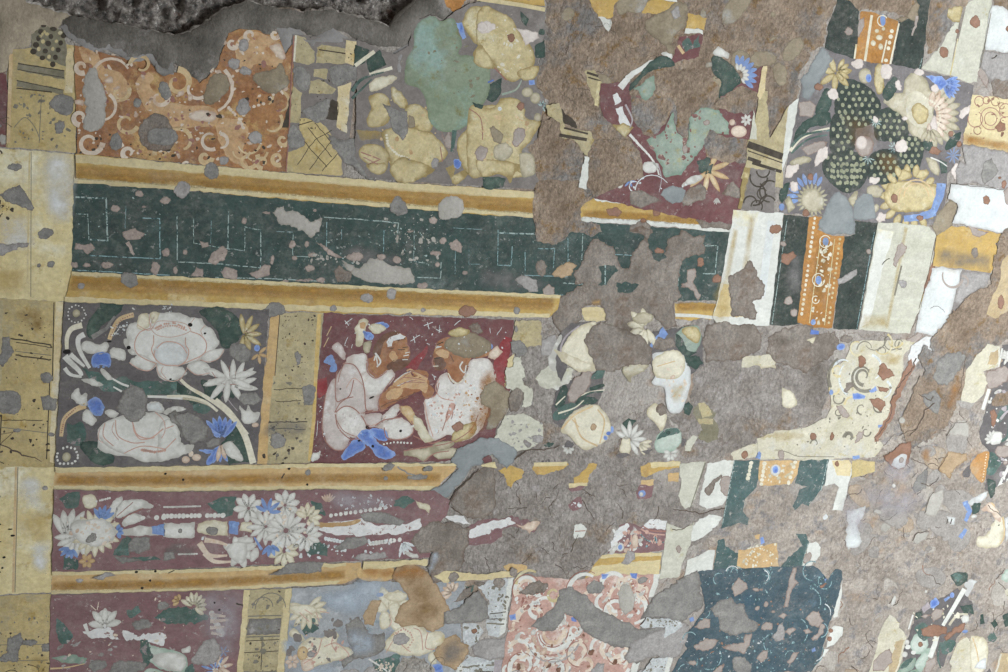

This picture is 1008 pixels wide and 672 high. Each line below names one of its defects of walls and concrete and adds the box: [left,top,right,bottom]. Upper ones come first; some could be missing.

spalling [263,302,285,318]
flaking render [335,0,1008,672]
spalling [112,537,150,573]
spalling [270,561,324,575]
spalling [0,632,50,663]
spalling [191,638,222,666]